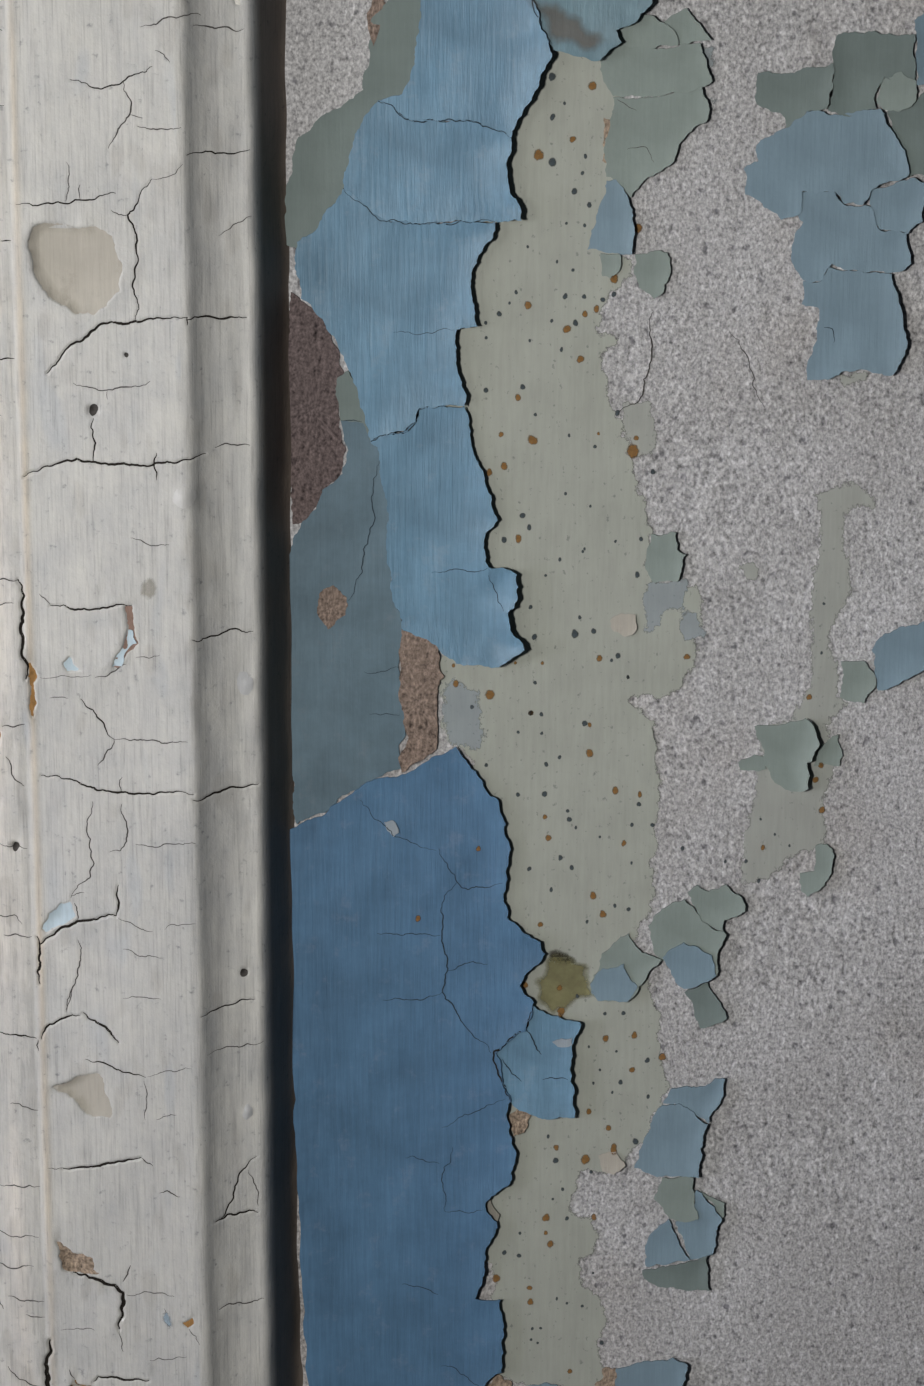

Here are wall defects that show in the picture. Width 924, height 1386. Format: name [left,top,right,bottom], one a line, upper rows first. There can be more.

crack [16,13,249,480]
peeling [285,0,924,1386]
crack [0,578,262,1120]
peeling [57,1241,99,1274]
crack [1,1157,178,1197]
crack [0,1230,199,1386]
crack [216,1156,259,1222]